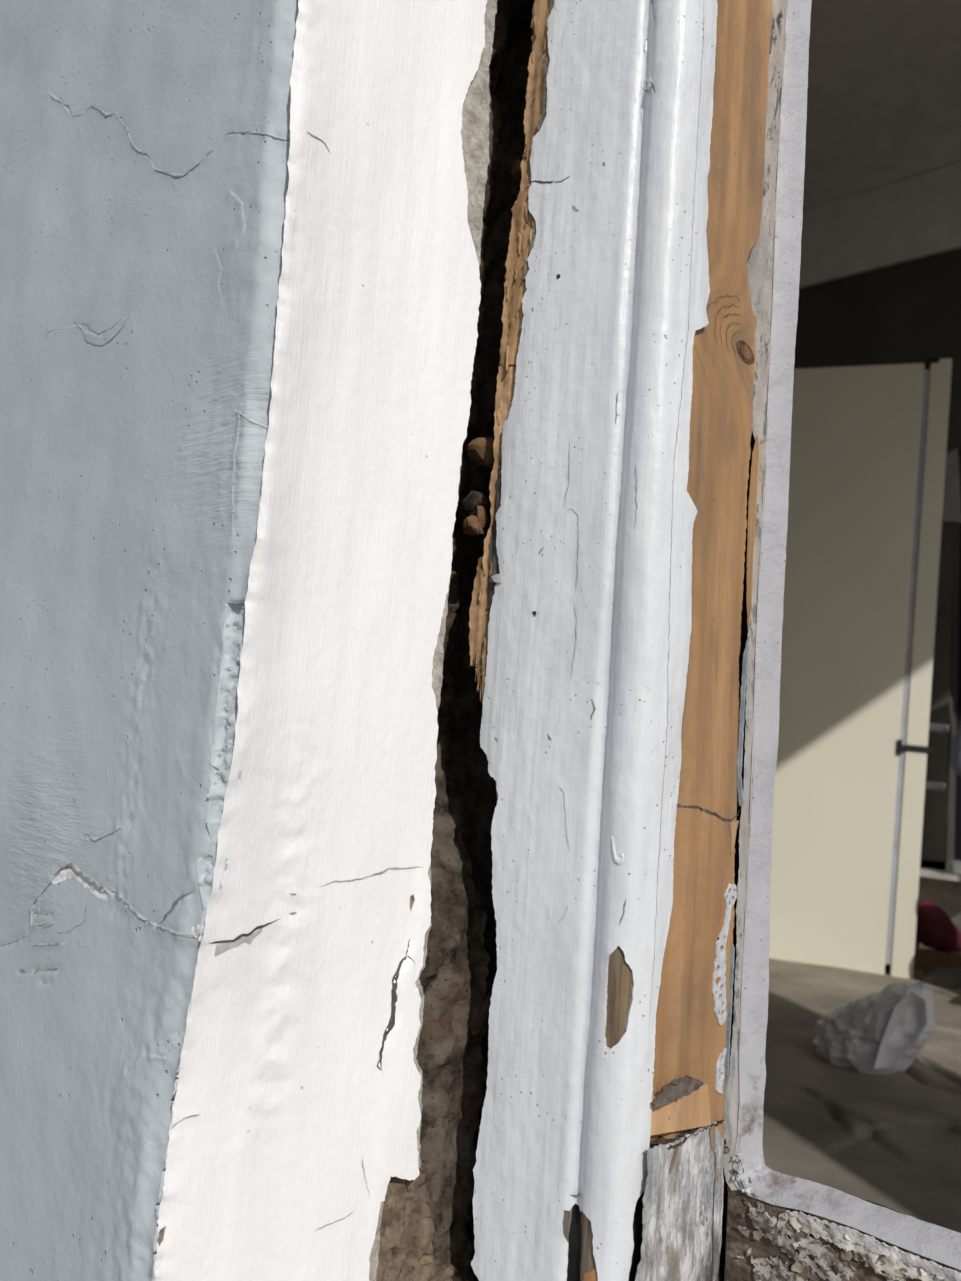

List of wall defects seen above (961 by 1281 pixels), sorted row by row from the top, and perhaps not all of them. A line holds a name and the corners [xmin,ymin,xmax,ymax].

crack [50,95,330,178]
flaking render [461,0,498,268]
peeling [536,56,550,131]
peeling [522,213,536,282]
crack [46,316,129,346]
flaking render [432,582,450,711]
crack [0,828,279,946]
crack [317,866,418,887]
crack [377,939,415,1070]
peeling [605,946,632,1048]
flaking render [369,906,469,1281]
peeling [709,883,961,1281]